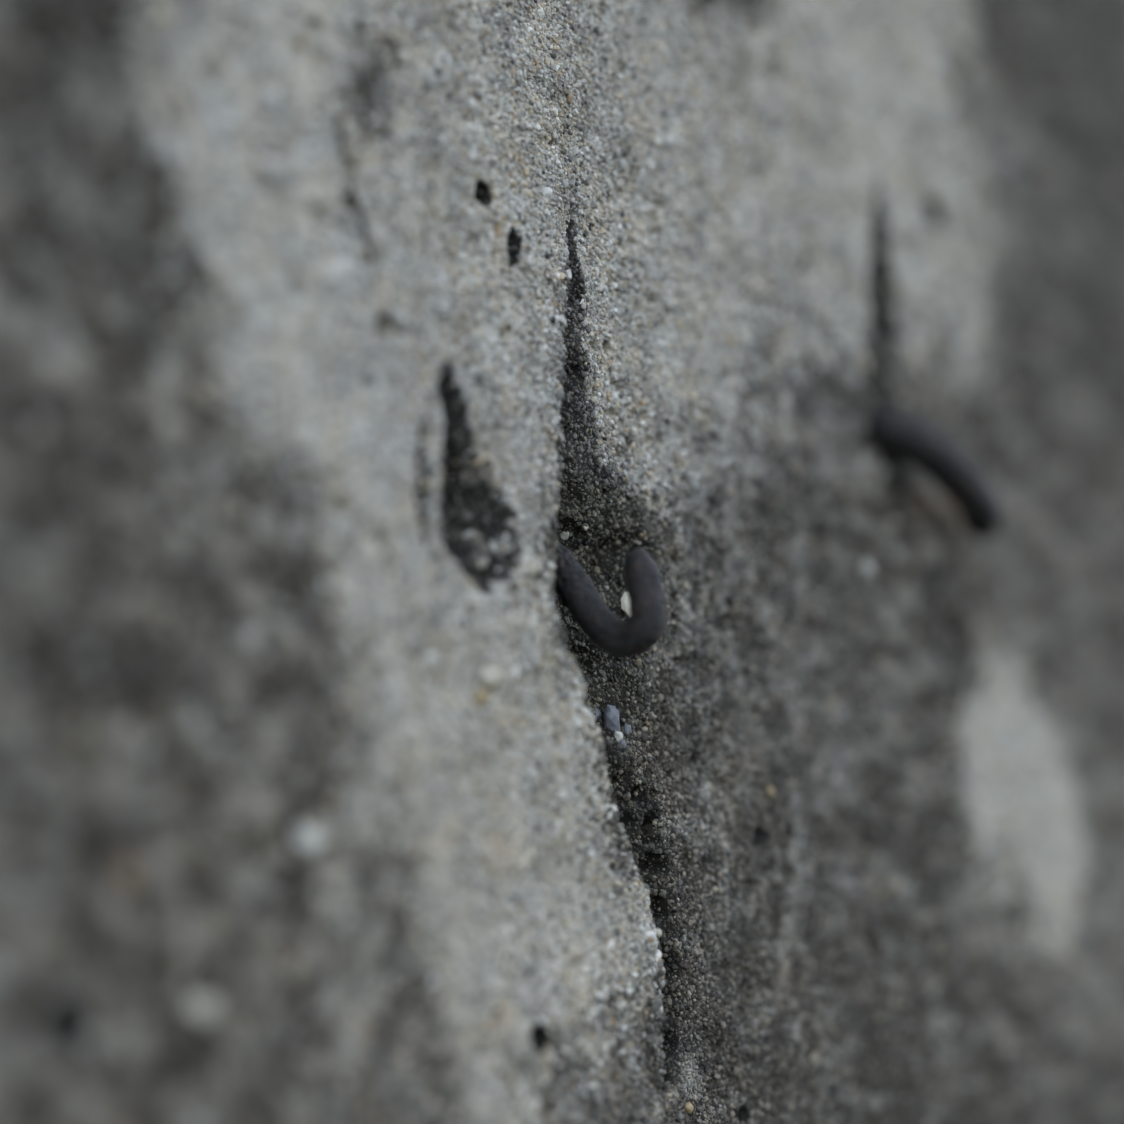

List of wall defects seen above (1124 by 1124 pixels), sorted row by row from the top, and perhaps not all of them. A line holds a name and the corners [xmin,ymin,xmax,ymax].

crack [556,203,636,497]
crack [608,778,686,1086]